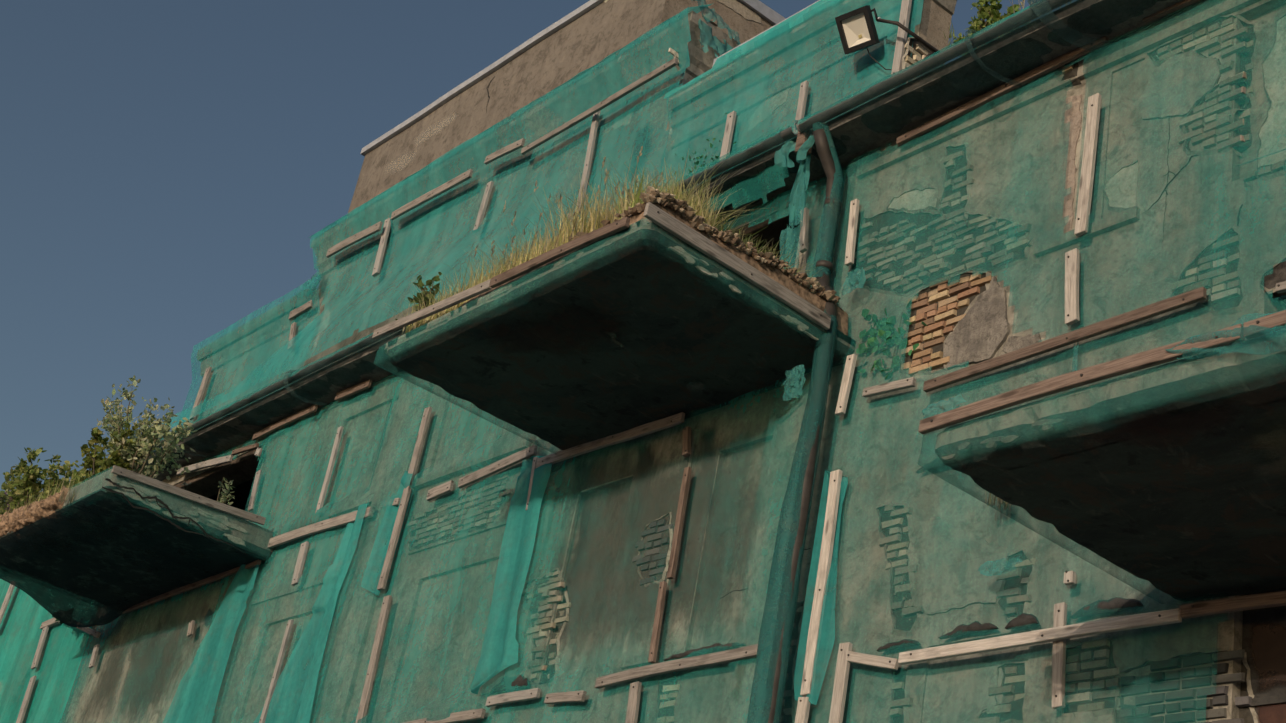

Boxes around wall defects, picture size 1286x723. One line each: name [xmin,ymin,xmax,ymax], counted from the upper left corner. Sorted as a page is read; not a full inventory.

flaking render [1147,12,1286,183]
flaking render [849,143,1032,376]
flaking render [1171,229,1249,316]
flaking render [632,512,673,587]
leakage [550,429,760,648]
flaking render [522,567,571,689]
flaking render [1061,636,1286,723]